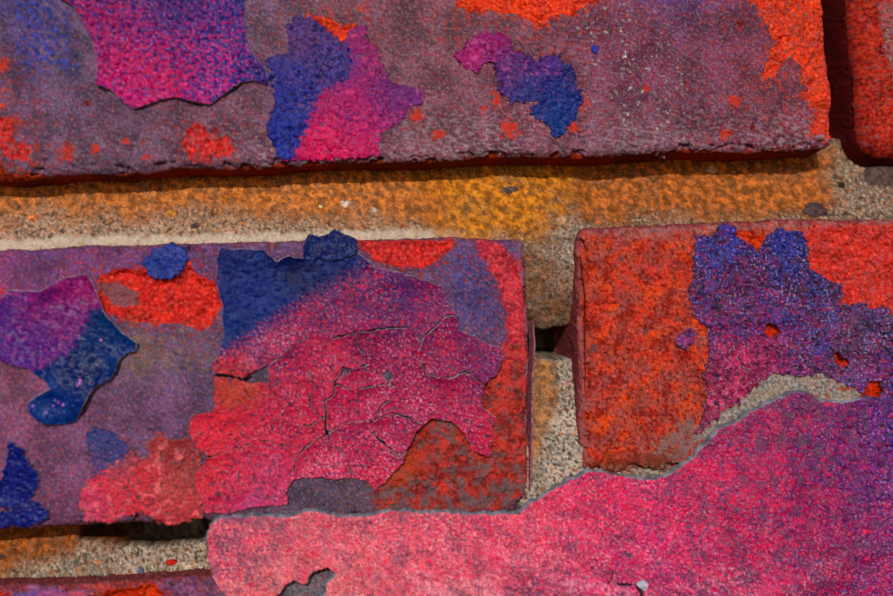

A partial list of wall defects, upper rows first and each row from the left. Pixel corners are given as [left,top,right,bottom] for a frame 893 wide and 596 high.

peeling [64,0,426,165]
peeling [454,31,584,138]
crack [215,373,252,381]
crack [324,327,393,442]
peeling [0,221,893,596]